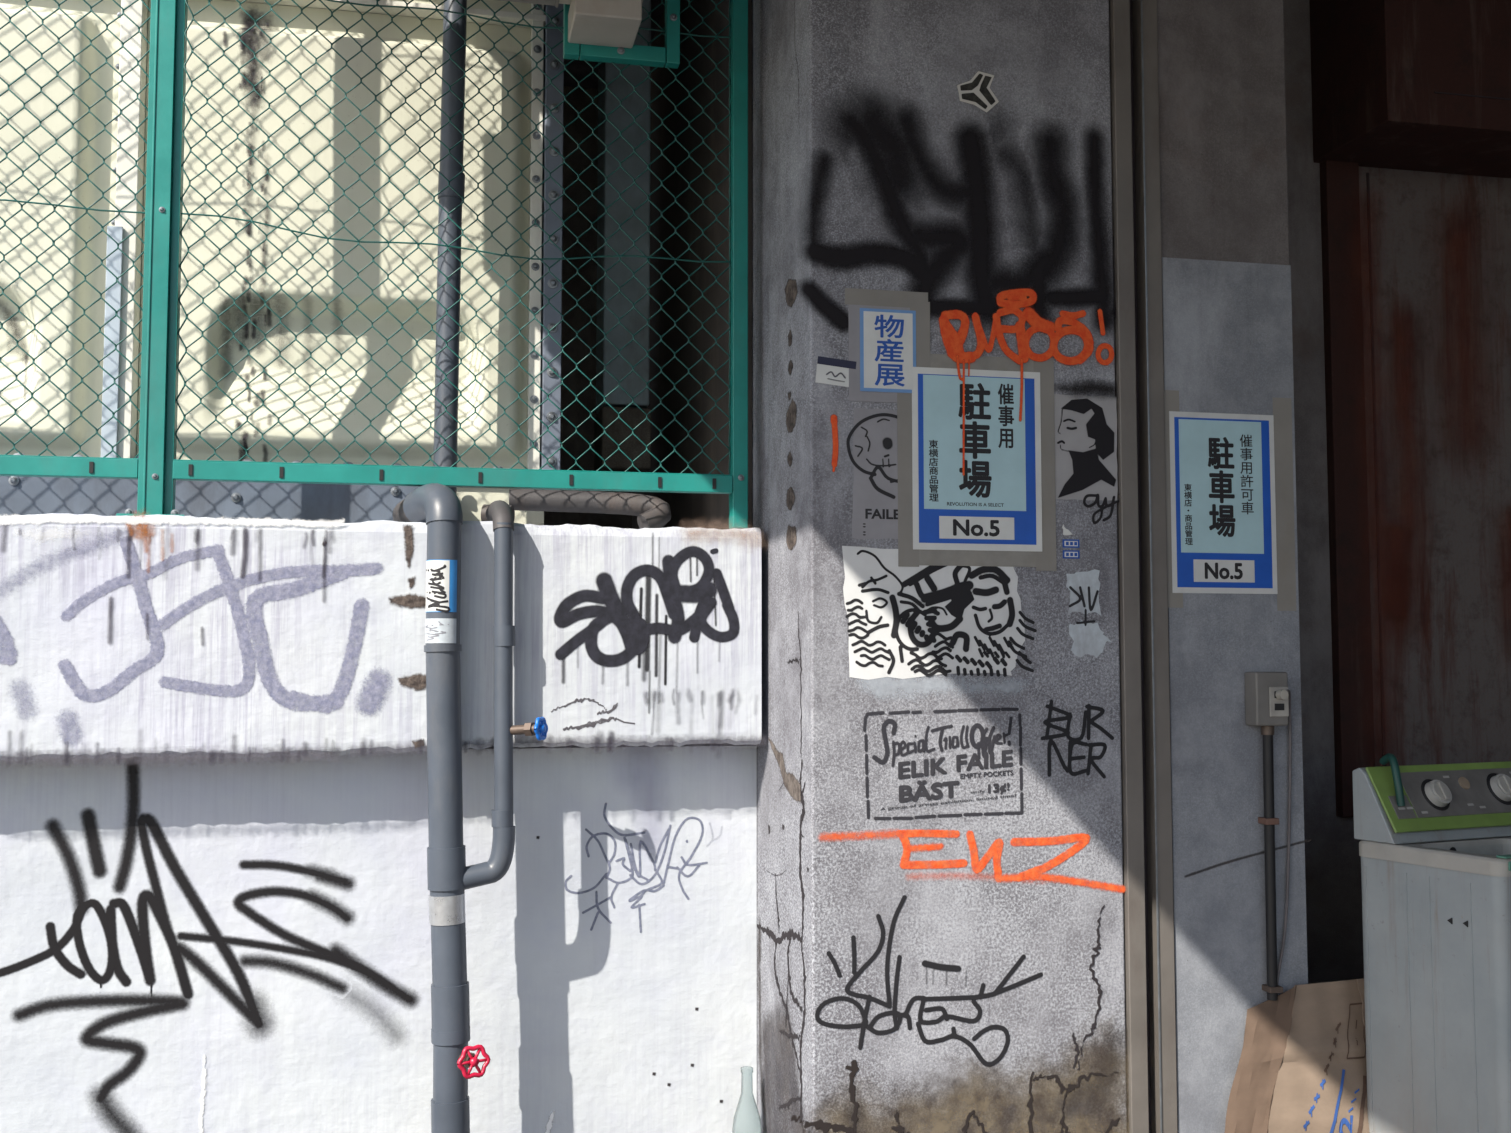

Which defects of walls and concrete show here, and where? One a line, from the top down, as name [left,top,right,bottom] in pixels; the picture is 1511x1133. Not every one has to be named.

water stain [223,10,269,101]
water stain [242,142,268,302]
water stain [236,303,271,462]
water stain [2,746,427,763]
crack [757,615,910,1133]
water stain [758,922,806,1133]
crack [962,1110,988,1133]
water stain [823,1034,1129,1133]
crack [1027,905,1120,1133]